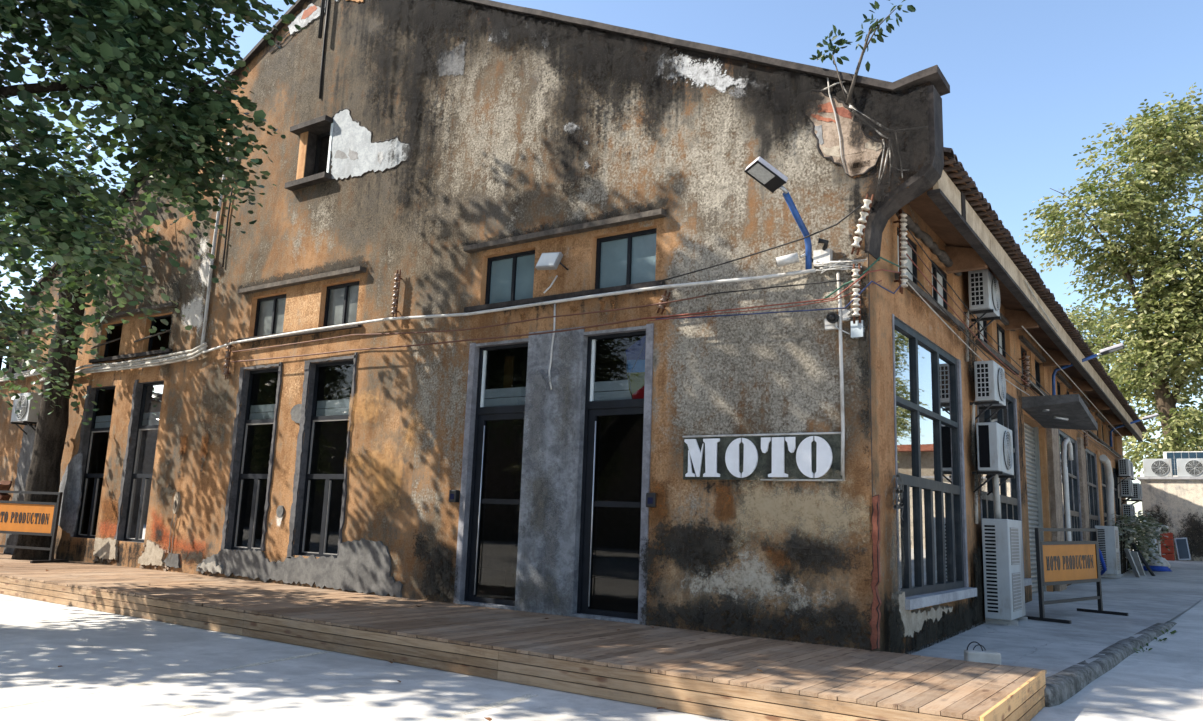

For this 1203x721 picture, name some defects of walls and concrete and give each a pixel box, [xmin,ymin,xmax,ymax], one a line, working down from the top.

peeling [274,0,364,51]
peeling [656,51,767,98]
spalling [330,108,409,181]
water stain [356,0,679,223]
spalling [805,90,884,177]
rust [151,511,206,566]
spalling [196,538,402,598]
water stain [412,530,458,602]
water stain [639,506,872,651]
flaking render [864,494,953,650]